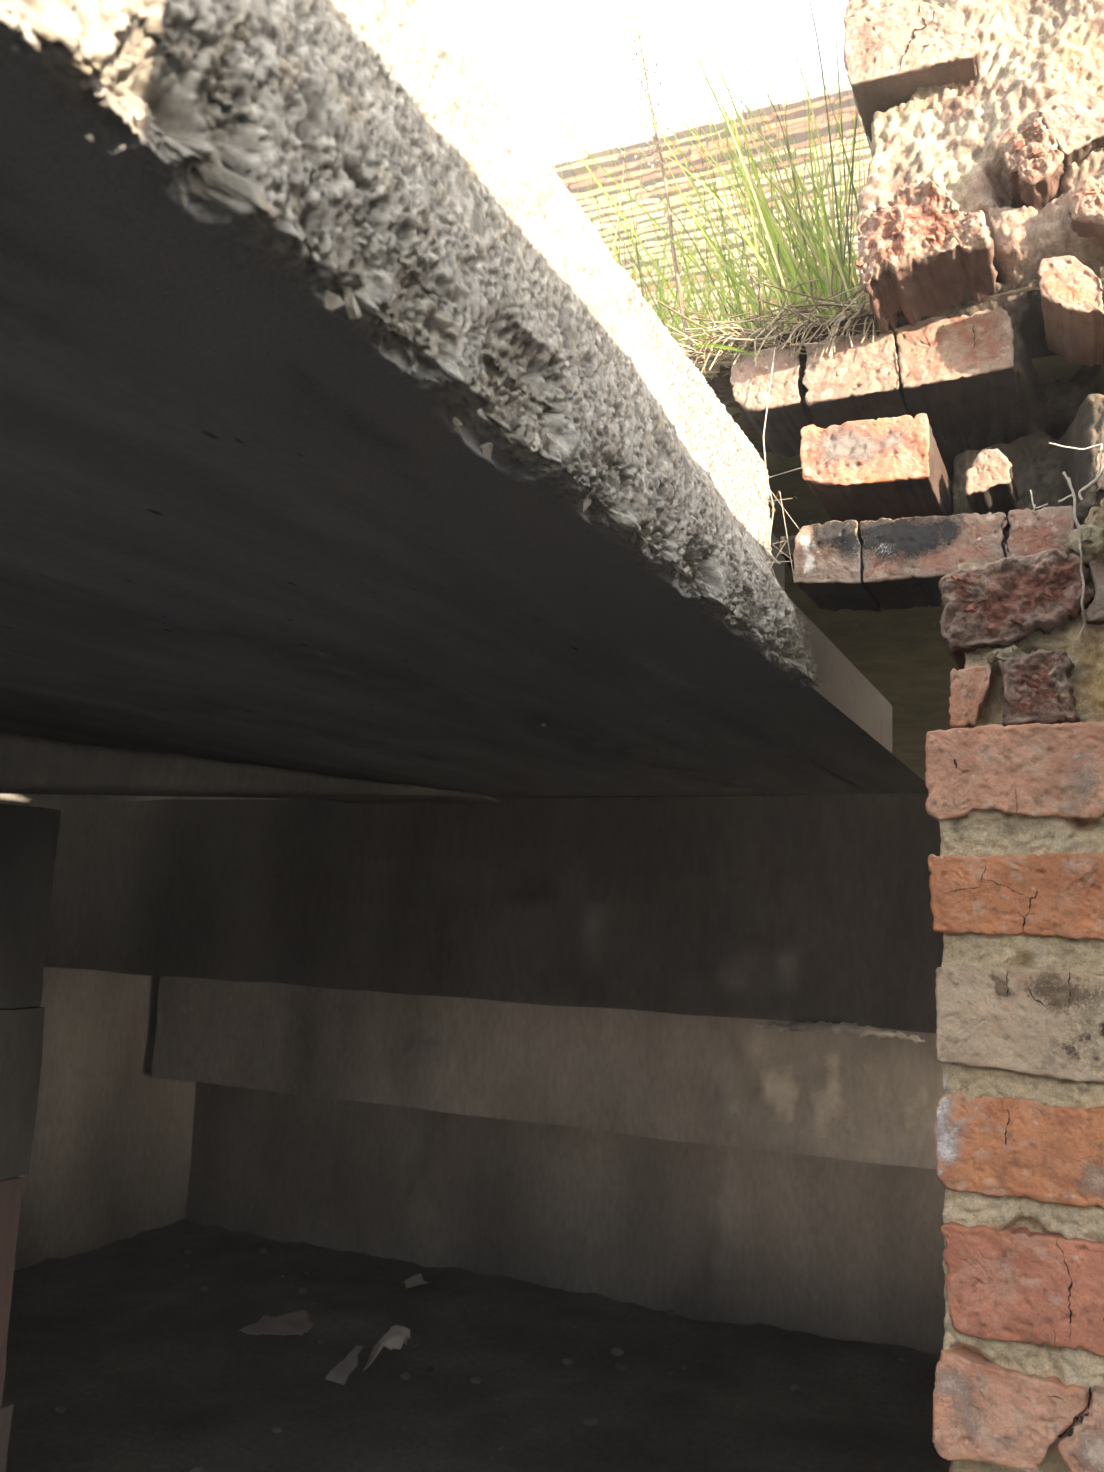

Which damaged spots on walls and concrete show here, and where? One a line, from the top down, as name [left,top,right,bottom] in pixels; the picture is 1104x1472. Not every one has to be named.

crack [900,1,935,67]
spalling [0,0,821,693]
crack [944,866,1038,932]
crack [1006,972,1071,1007]
spalling [755,1021,925,1043]
crack [1054,1242,1104,1347]
crack [1049,1387,1092,1438]